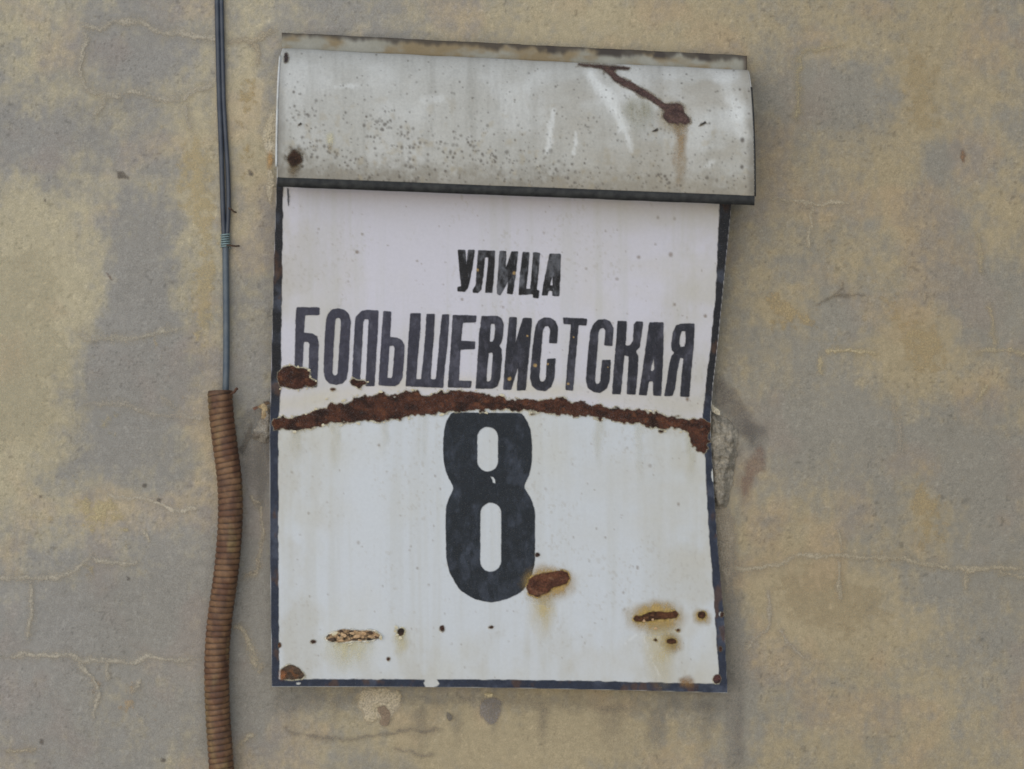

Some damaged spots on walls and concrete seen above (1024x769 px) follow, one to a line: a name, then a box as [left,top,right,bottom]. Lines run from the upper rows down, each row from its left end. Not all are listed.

crack [0,529,192,719]
crack [733,530,1024,600]